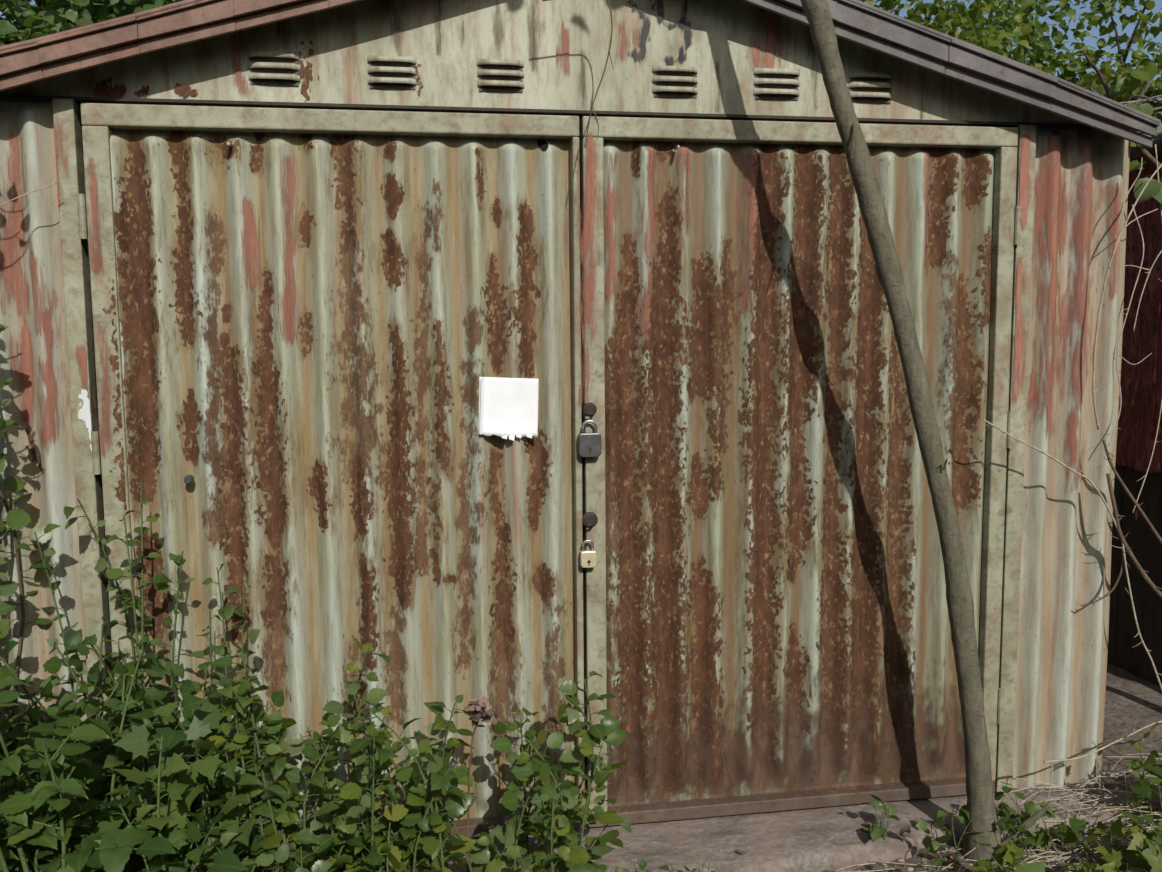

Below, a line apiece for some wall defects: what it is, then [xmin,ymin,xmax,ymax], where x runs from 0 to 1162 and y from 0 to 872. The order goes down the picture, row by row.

rust [91,77,153,97]
rust [174,83,198,98]
rust [298,40,319,101]
peeling [0,127,110,456]
rust [102,131,568,764]
rust [605,141,966,810]
rust [925,147,992,517]
peeling [1013,131,1121,483]